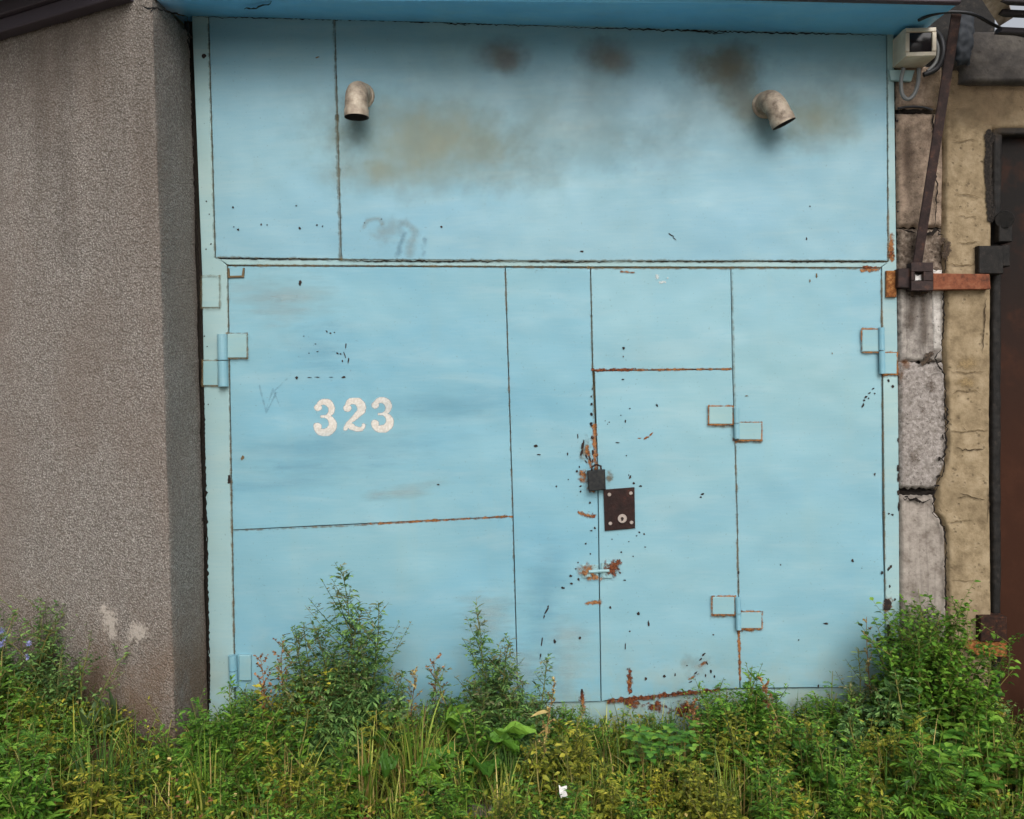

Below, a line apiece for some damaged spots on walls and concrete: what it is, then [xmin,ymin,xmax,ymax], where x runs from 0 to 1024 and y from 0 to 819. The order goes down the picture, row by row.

crack [903,175,990,619]
rust [579,445,595,493]
rust [578,559,622,580]
rust [647,698,699,719]